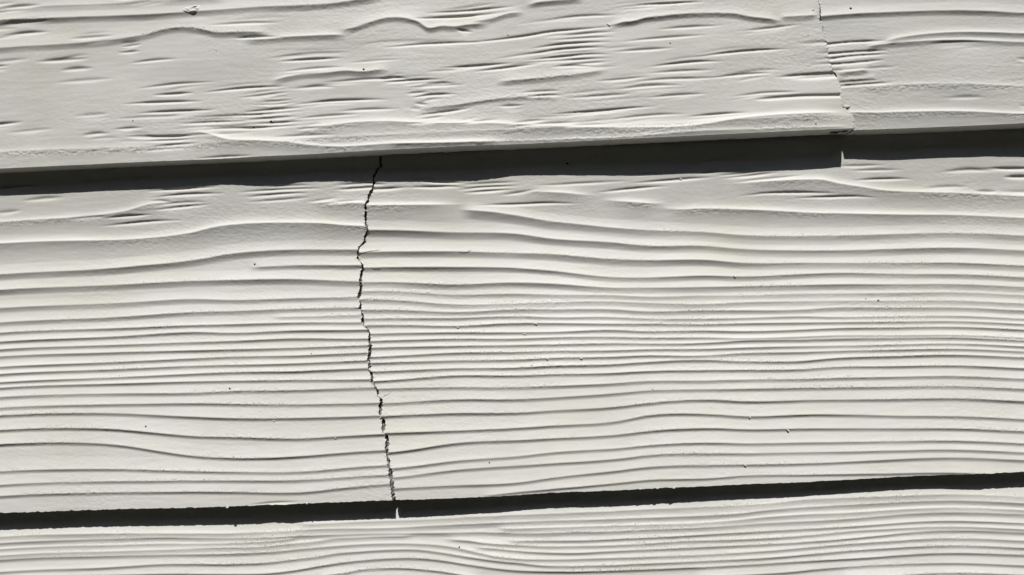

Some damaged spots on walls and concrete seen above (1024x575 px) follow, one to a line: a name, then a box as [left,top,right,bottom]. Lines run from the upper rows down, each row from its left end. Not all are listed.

crack [356,156,395,500]